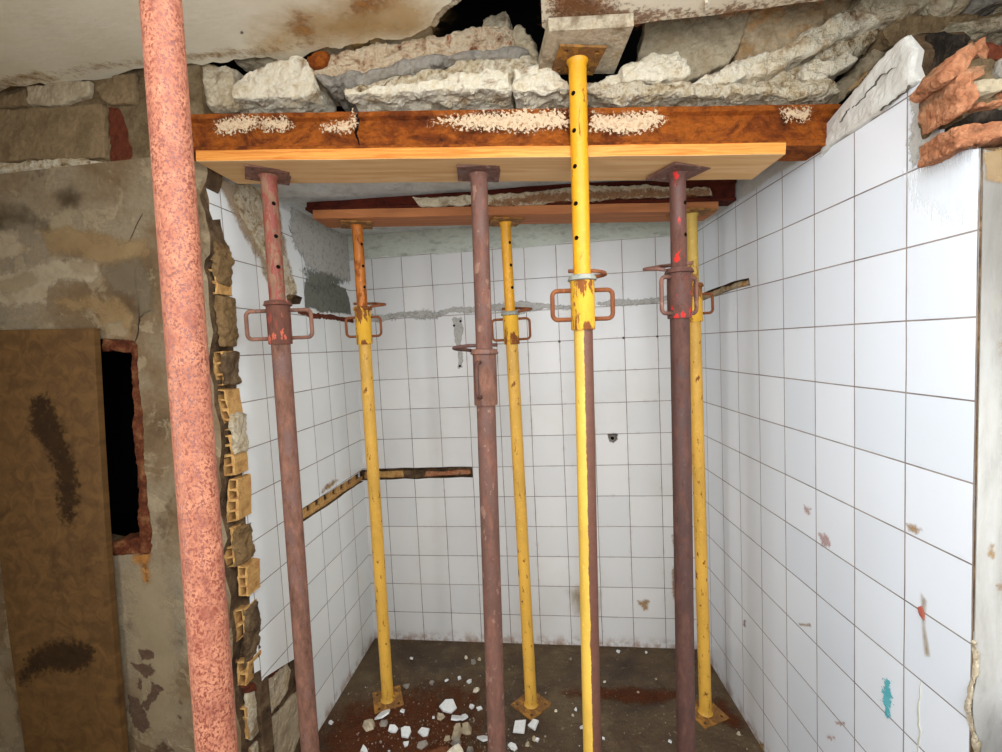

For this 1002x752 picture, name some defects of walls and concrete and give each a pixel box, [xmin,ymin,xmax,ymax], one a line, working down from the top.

rust [292,0,418,39]
peeling [370,0,461,44]
rust [541,0,823,27]
peeling [234,57,277,72]
peeling [318,45,355,55]
peeling [820,31,970,157]
flaking render [221,179,268,281]
flaking render [280,215,297,298]
spalling [964,640,981,752]